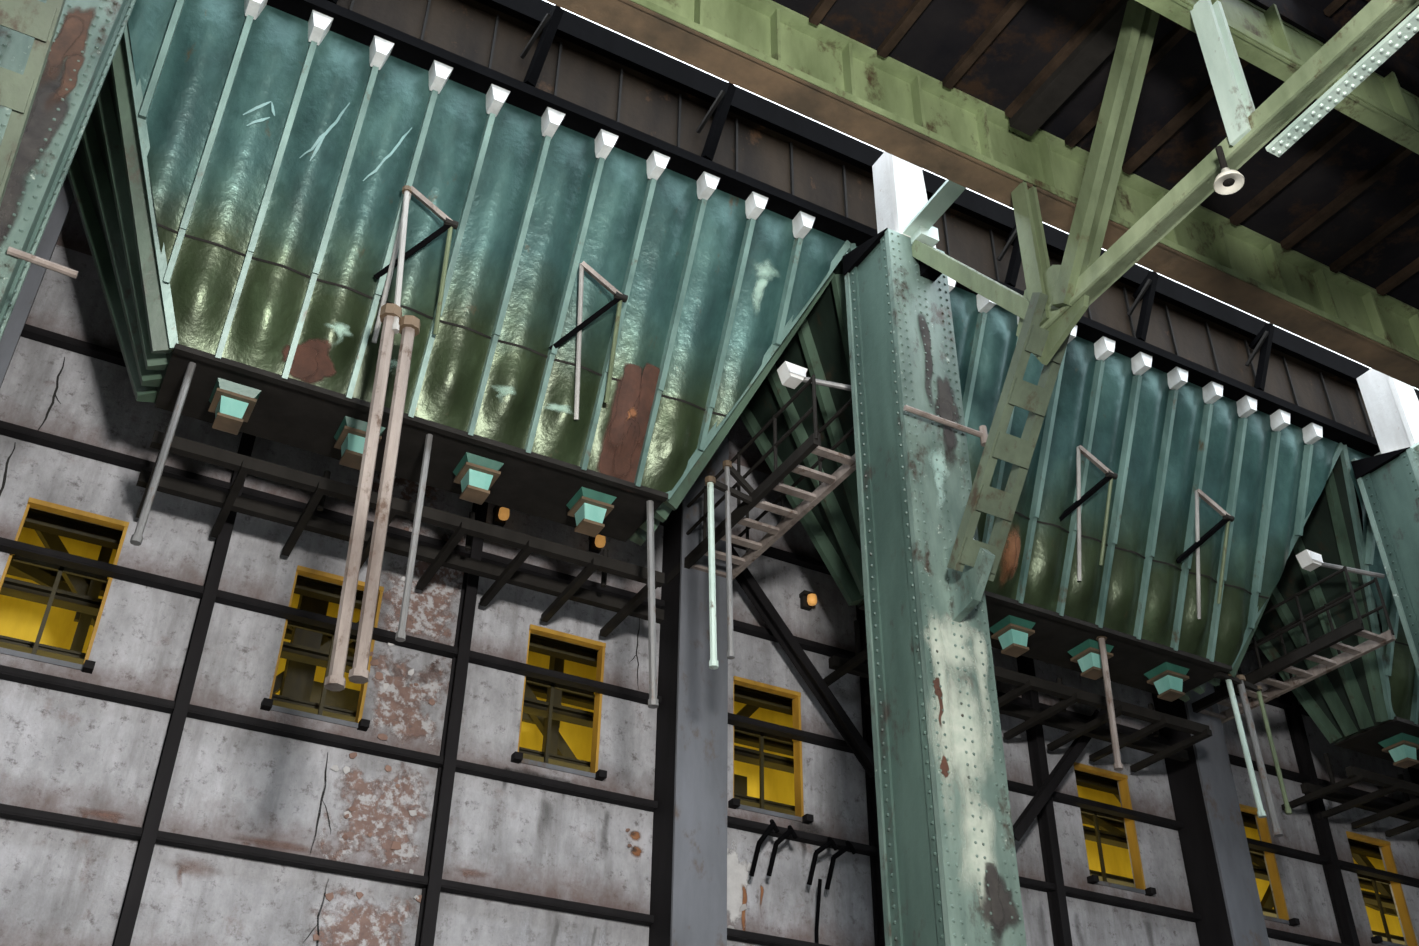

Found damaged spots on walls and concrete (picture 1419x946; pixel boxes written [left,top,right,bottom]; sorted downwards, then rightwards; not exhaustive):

corrosion [44,8,95,104]
corrosion [283,339,336,384]
crack [0,357,65,496]
corrosion [598,363,660,483]
flaking render [319,752,429,874]
flaking render [313,888,422,946]